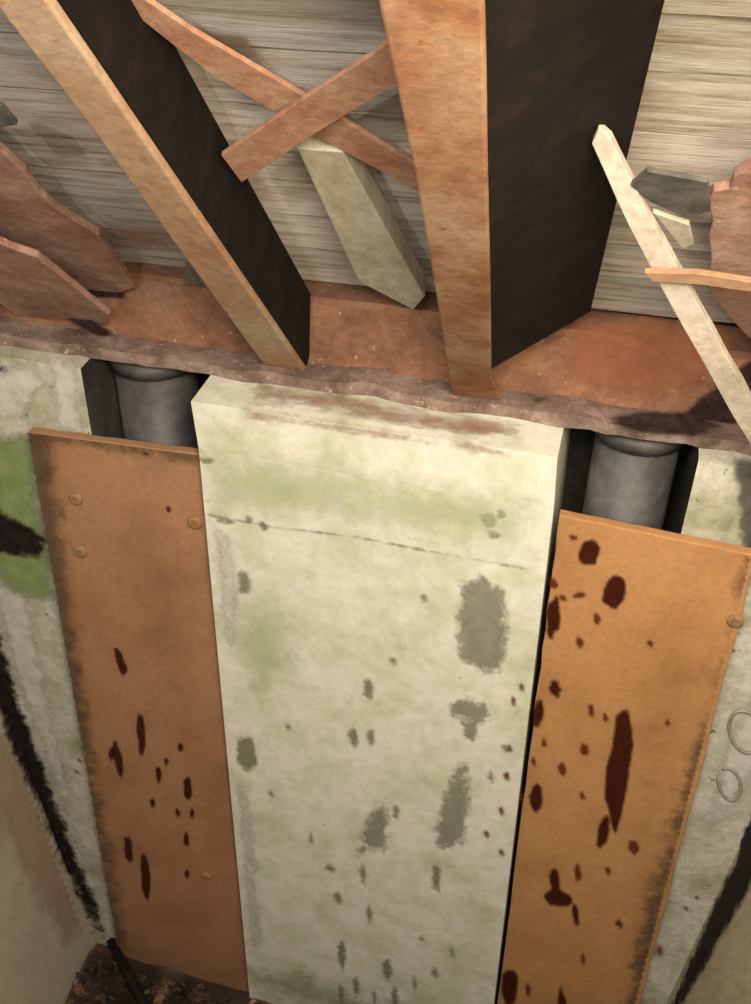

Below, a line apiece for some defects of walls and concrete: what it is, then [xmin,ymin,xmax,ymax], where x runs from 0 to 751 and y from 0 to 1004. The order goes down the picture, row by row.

leakage [0,510,45,558]
leakage [570,535,600,564]
leakage [456,576,509,672]
leakage [546,578,585,639]
leakage [602,576,626,608]
leakage [0,636,104,932]
leakage [237,739,257,771]
leakage [437,766,471,848]
leakage [519,784,542,812]
leakage [589,705,633,847]
leakage [545,869,579,925]
leakage [671,824,751,1004]